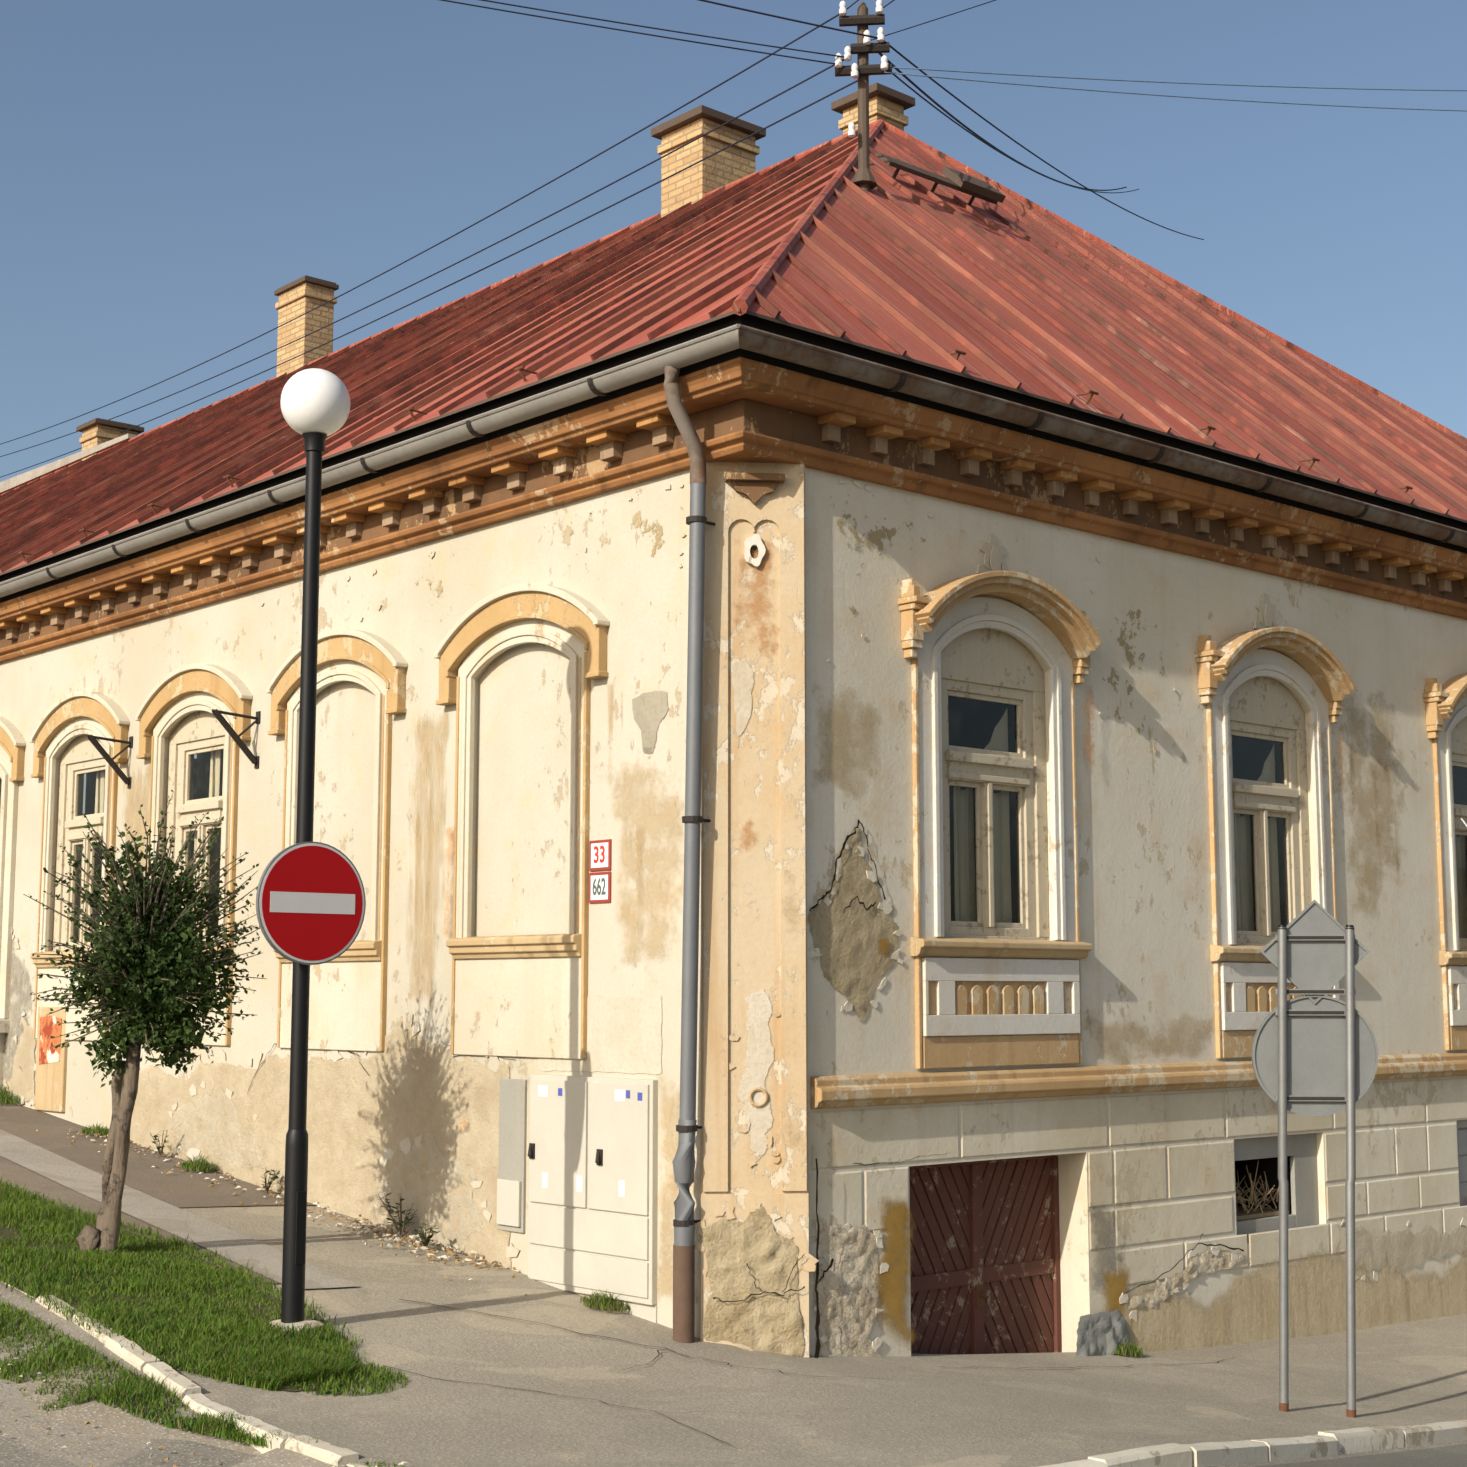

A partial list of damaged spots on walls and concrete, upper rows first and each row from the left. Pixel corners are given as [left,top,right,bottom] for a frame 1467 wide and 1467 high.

peeling [731,658,754,747]
flaking render [807,826,904,1022]
peeling [728,989,781,1167]
flaking render [694,1201,889,1357]
flaking render [1119,1244,1245,1322]